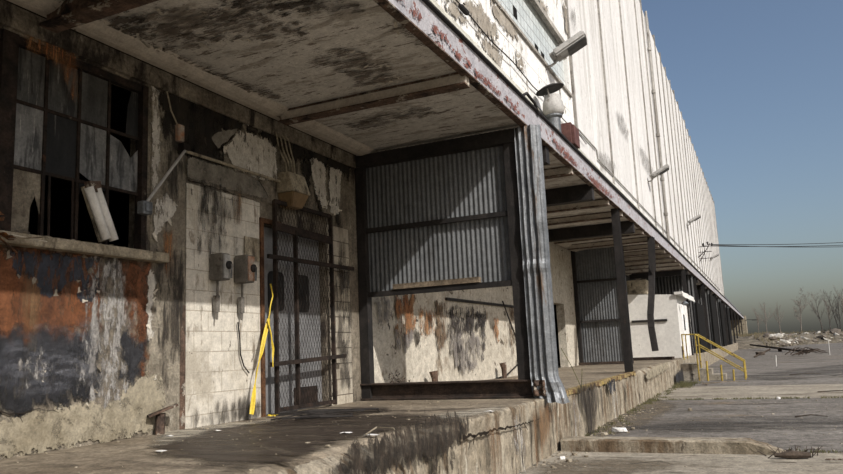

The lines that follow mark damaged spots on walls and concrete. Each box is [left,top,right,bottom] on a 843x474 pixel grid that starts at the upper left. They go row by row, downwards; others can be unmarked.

leakage [190,0,365,37]
corrosion [373,0,528,127]
peeling [151,85,161,190]
peeling [223,124,278,181]
peeling [310,158,342,215]
corrosion [541,138,744,319]
corrosion [0,232,103,343]
spalling [0,323,167,458]
corrosion [120,260,152,377]
leakage [152,397,452,468]
leakage [446,305,487,375]
crack [462,418,540,444]